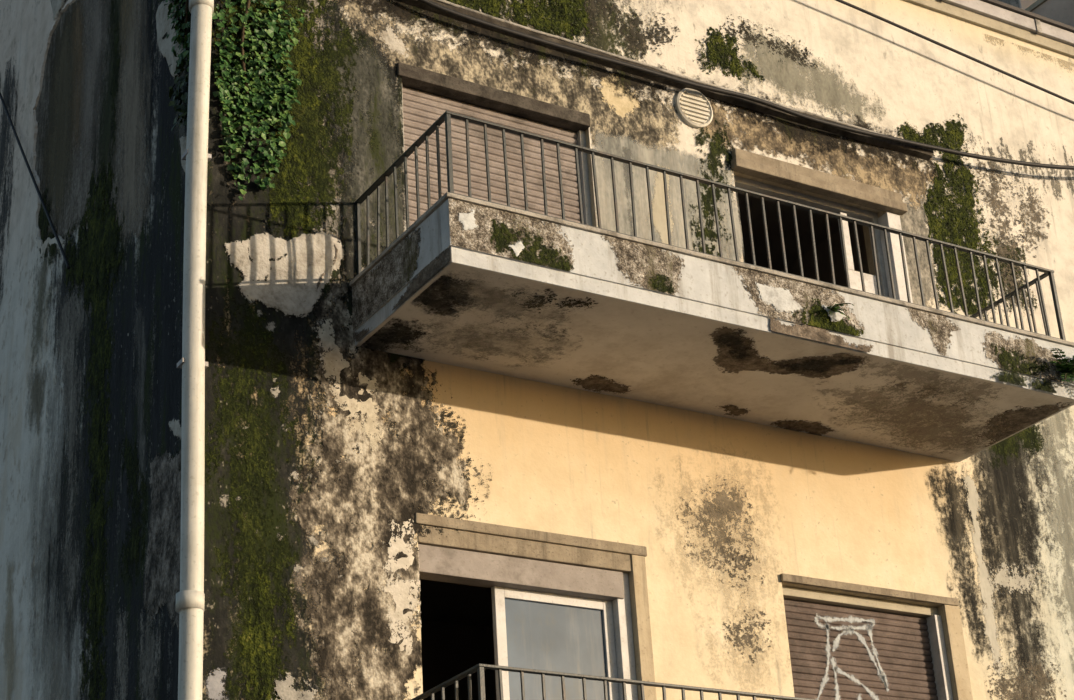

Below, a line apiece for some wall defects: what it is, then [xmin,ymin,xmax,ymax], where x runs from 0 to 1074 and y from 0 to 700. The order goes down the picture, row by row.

water stain [0,59,18,303]
flaking render [31,0,153,316]
water stain [294,0,939,308]
water stain [114,611,161,700]
water stain [134,309,146,499]
peeling [288,198,575,700]
water stain [381,382,492,551]
water stain [349,274,598,377]
spalling [570,374,632,394]
water stain [677,475,772,666]
water stain [926,408,1074,700]